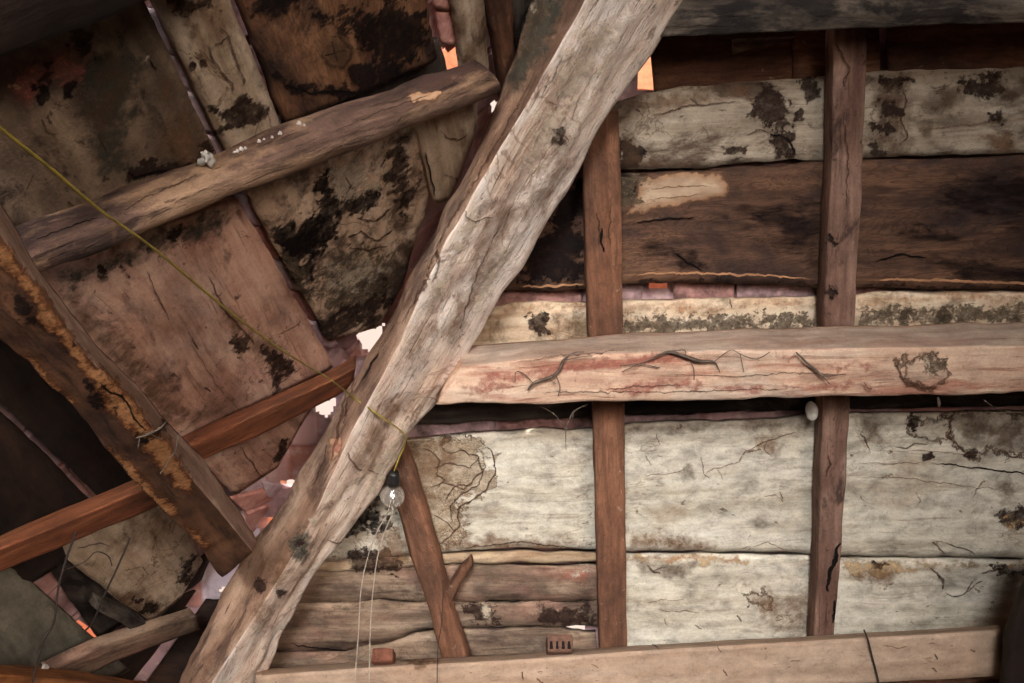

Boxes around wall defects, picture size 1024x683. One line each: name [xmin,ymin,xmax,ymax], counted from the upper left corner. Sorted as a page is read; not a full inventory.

water stain [250,0,434,101]
water stain [655,76,821,159]
water stain [863,70,1024,158]
water stain [619,133,694,223]
water stain [269,136,422,339]
water stain [672,250,704,271]
water stain [742,203,820,250]
water stain [623,300,816,333]
water stain [858,295,1024,326]
crack [860,434,1024,489]